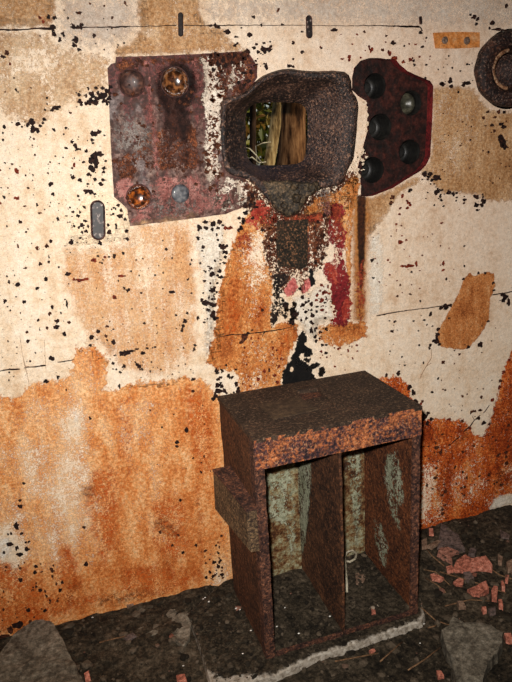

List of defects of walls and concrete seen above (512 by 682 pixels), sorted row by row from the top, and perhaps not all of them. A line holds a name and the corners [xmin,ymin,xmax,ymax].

crack [0,23,423,31]
peeling [2,97,61,156]
corrosion [112,50,255,184]
peeling [36,0,512,401]
crack [221,327,290,337]
corrosion [206,171,369,392]
crack [376,305,450,316]
corrosion [379,374,413,400]
corrosion [419,351,512,530]
corrosion [0,347,233,636]
peeling [204,535,224,580]